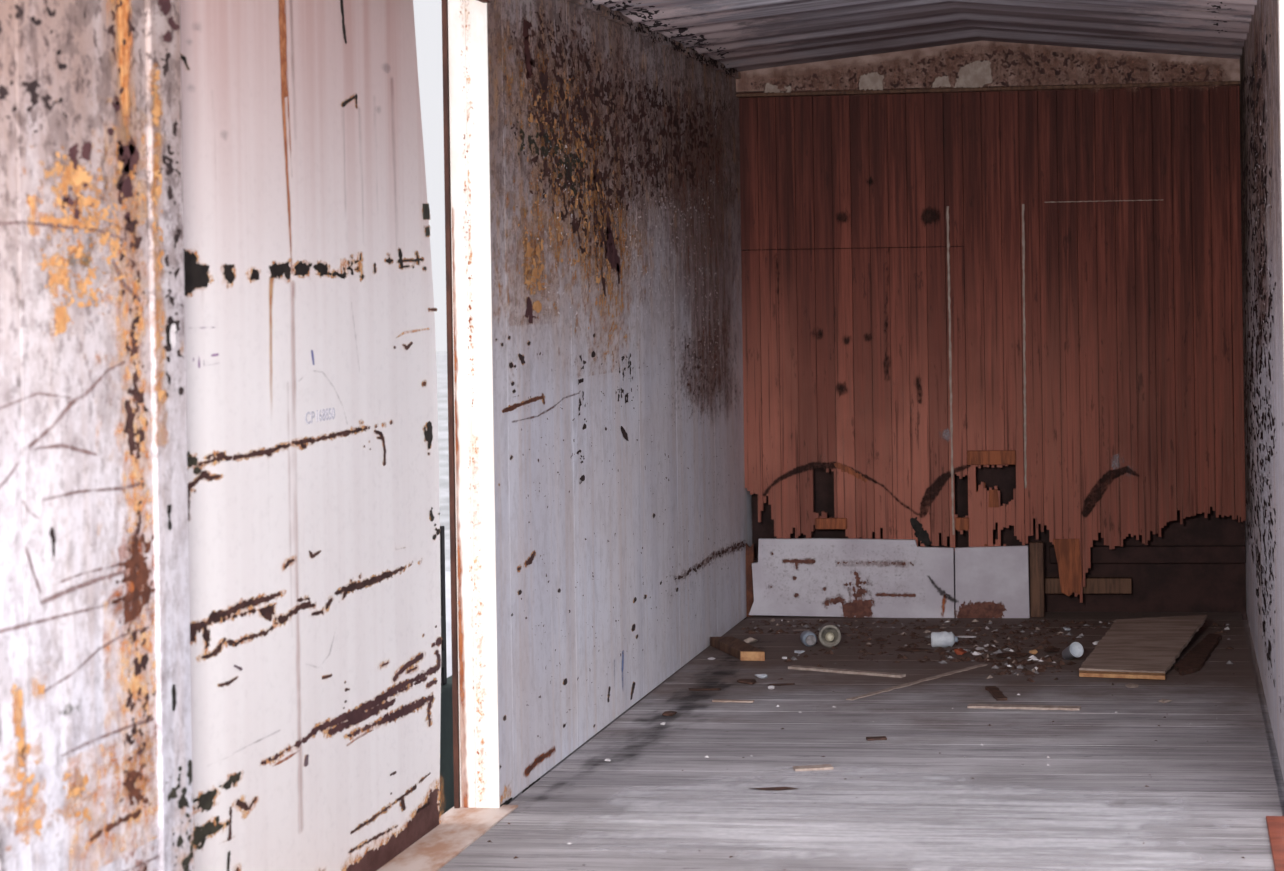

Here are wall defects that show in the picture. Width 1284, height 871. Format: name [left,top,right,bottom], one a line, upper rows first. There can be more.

peeling [26,0,427,407]
peeling [496,0,739,492]
damp [673,116,730,405]
damp [1239,32,1267,532]
rust [69,0,158,871]
peeling [187,421,392,521]
peeling [423,421,433,455]
peeling [190,562,420,660]
peeling [823,561,916,618]
peeling [261,625,442,767]
peeling [349,773,430,853]
rust [342,782,441,871]